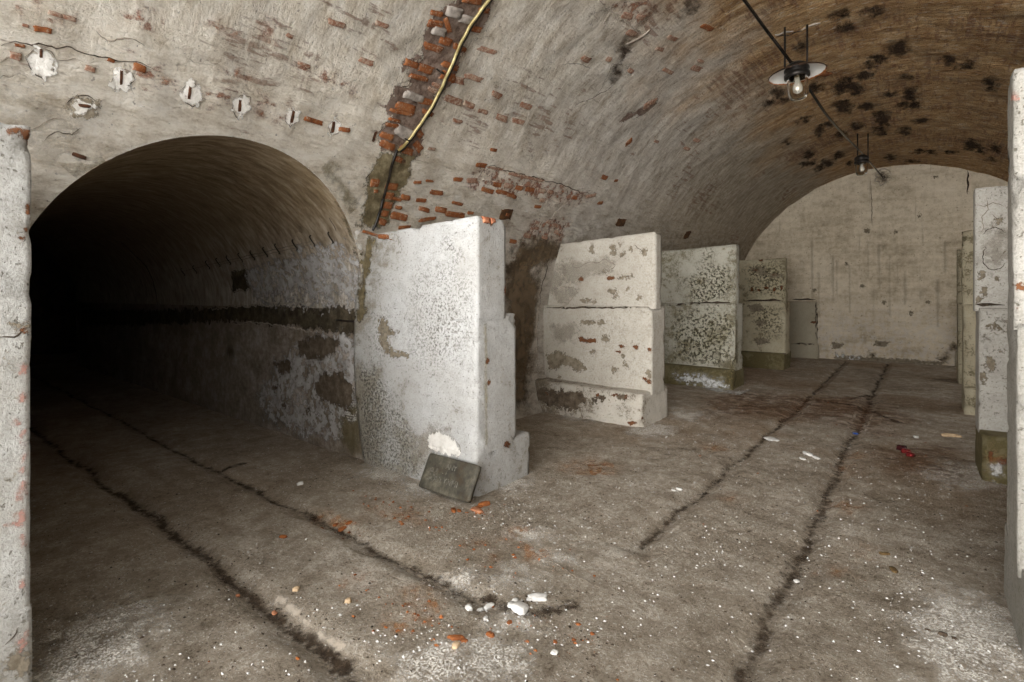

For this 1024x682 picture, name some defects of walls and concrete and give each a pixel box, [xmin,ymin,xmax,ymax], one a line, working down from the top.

crack [1,32,153,160]
flaking render [378,0,533,158]
crack [967,170,1006,270]
flaking render [81,179,514,441]
leakage [505,234,615,403]
spalling [537,319,627,412]
leakage [673,323,747,395]